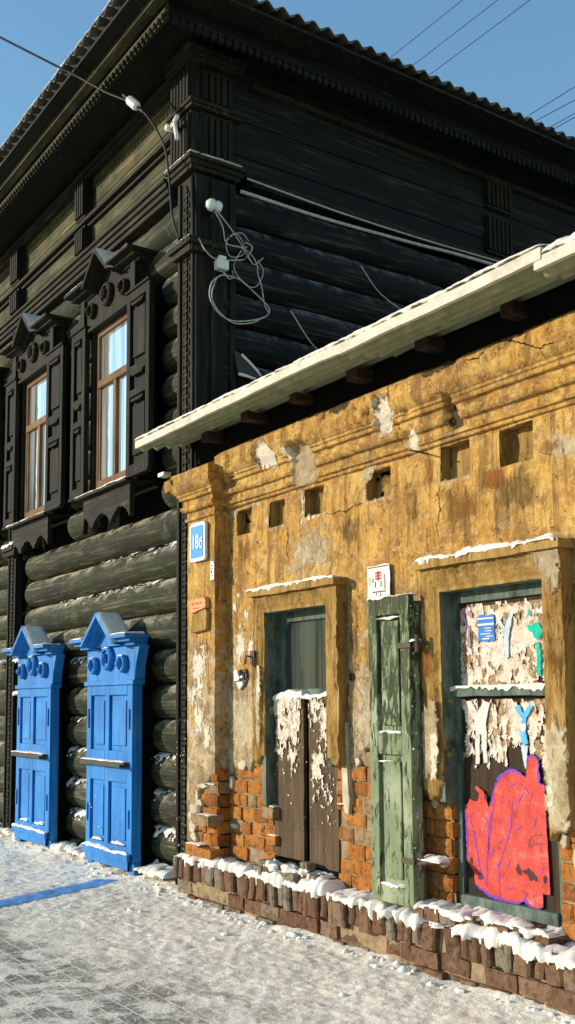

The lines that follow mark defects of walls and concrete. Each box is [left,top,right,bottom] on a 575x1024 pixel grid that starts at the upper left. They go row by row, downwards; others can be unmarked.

spalling [369,390,395,439]
spalling [406,425,420,452]
crack [459,331,557,369]
spalling [253,440,331,580]
spalling [185,593,283,863]
spalling [273,667,372,892]
spalling [421,698,439,780]
spalling [543,715,575,943]